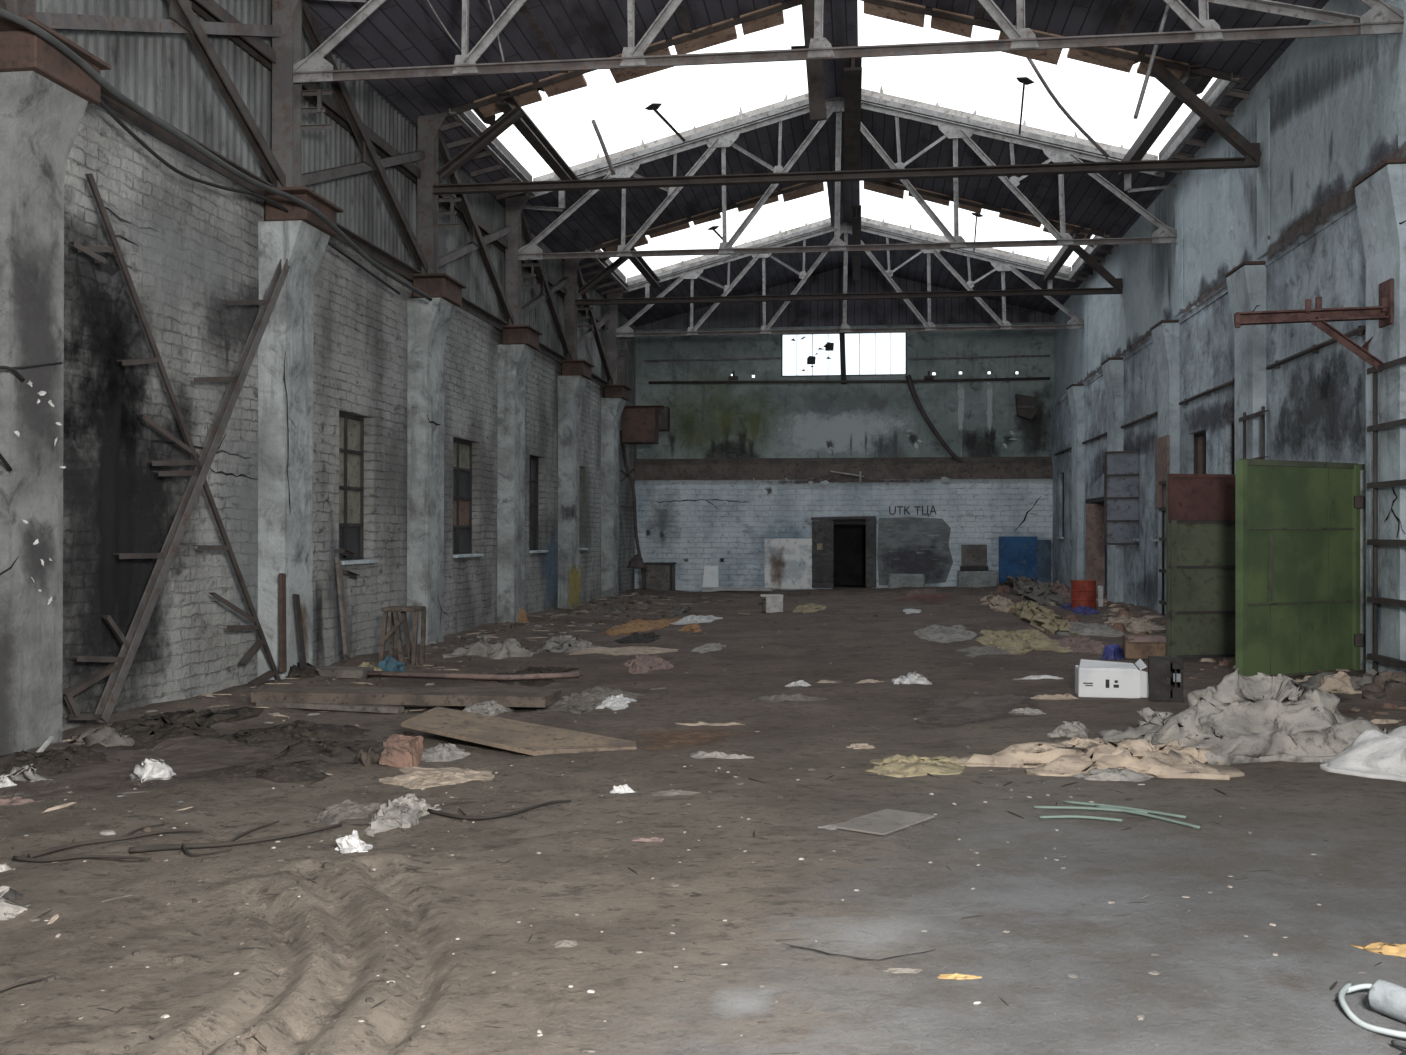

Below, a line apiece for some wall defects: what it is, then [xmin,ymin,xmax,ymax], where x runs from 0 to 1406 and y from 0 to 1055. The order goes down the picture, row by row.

damp [1248,61,1363,143]
damp [98,403,135,635]
crack [1384,487,1405,538]